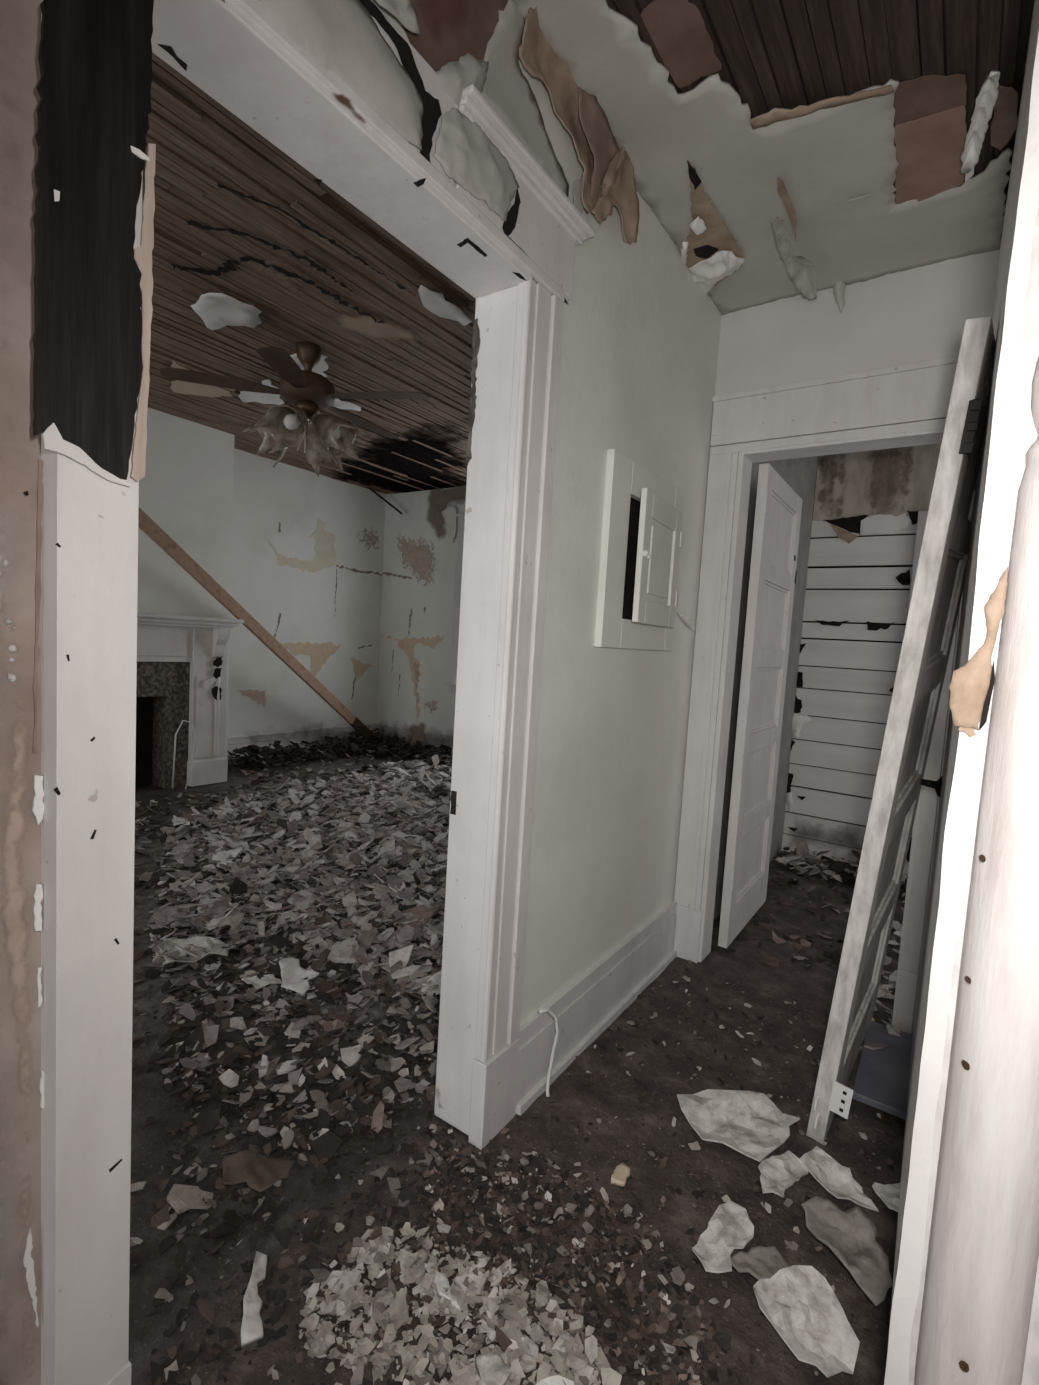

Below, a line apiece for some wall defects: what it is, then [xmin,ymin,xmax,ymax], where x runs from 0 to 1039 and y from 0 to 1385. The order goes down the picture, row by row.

peeling [158,44,187,71]
flaking render [402,0,508,72]
flaking render [640,0,722,88]
peeling [130,146,150,161]
flaking render [894,74,967,205]
peeling [457,238,487,257]
peeling [999,202,1039,580]
water stain [871,448,913,508]
flaking render [0,423,130,1109]
peeling [908,619,1002,1385]
flaking render [19,1175,39,1364]
peeling [1021,1258,1039,1385]